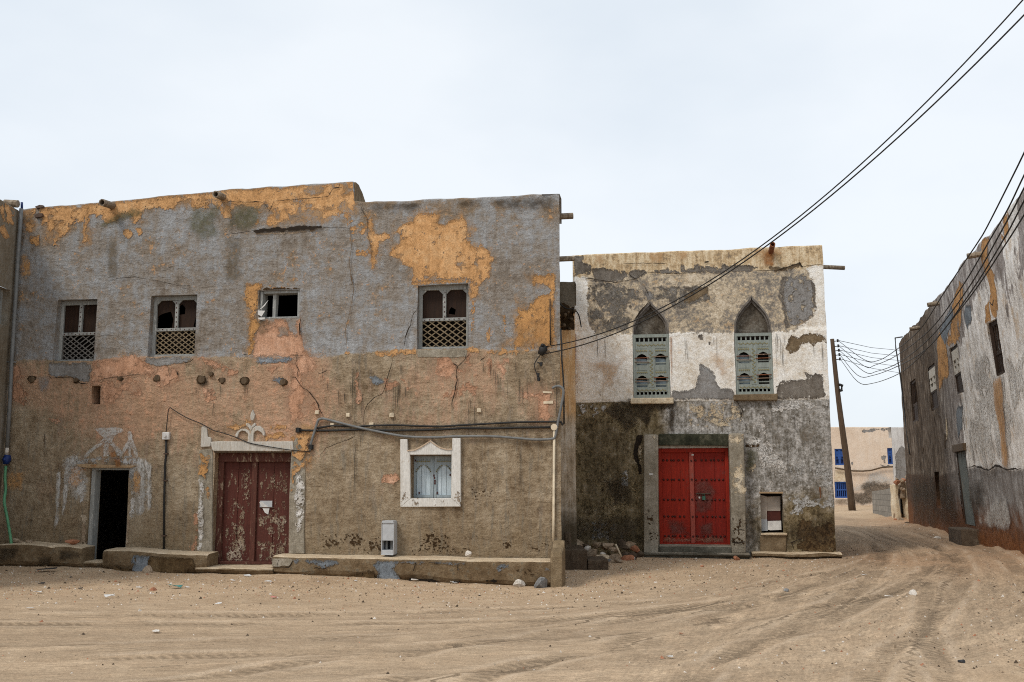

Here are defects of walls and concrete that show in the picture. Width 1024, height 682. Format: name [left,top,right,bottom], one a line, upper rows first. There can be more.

flaking render [0,182,494,331]
flaking render [225,282,322,564]
crack [225,187,372,348]
crack [294,318,327,413]
crack [452,355,485,410]
flaking render [435,273,575,400]
water stain [607,401,676,431]
flaking render [574,255,827,354]
flaking render [671,364,853,552]
flaking render [937,281,963,392]
water stain [969,485,1010,528]
flaking render [968,353,1024,467]